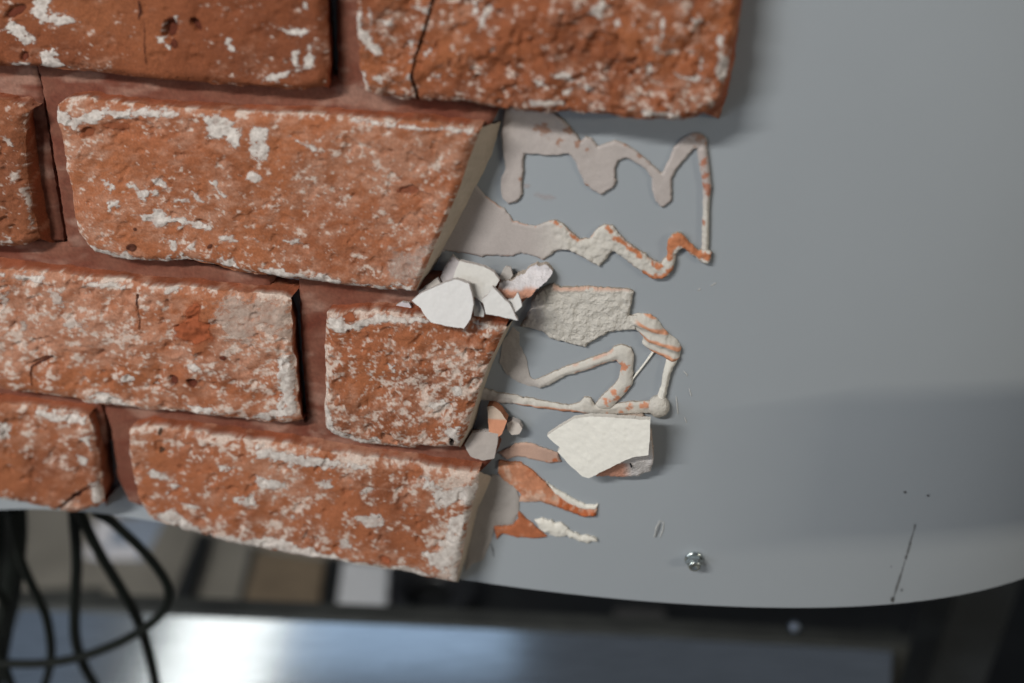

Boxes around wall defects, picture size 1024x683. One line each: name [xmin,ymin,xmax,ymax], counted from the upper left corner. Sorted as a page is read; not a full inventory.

crack [410,0,435,99]
peeling [641,110,682,119]
peeling [428,387,462,412]
peeling [445,427,461,445]
peeling [507,417,523,435]
spalling [547,413,654,478]